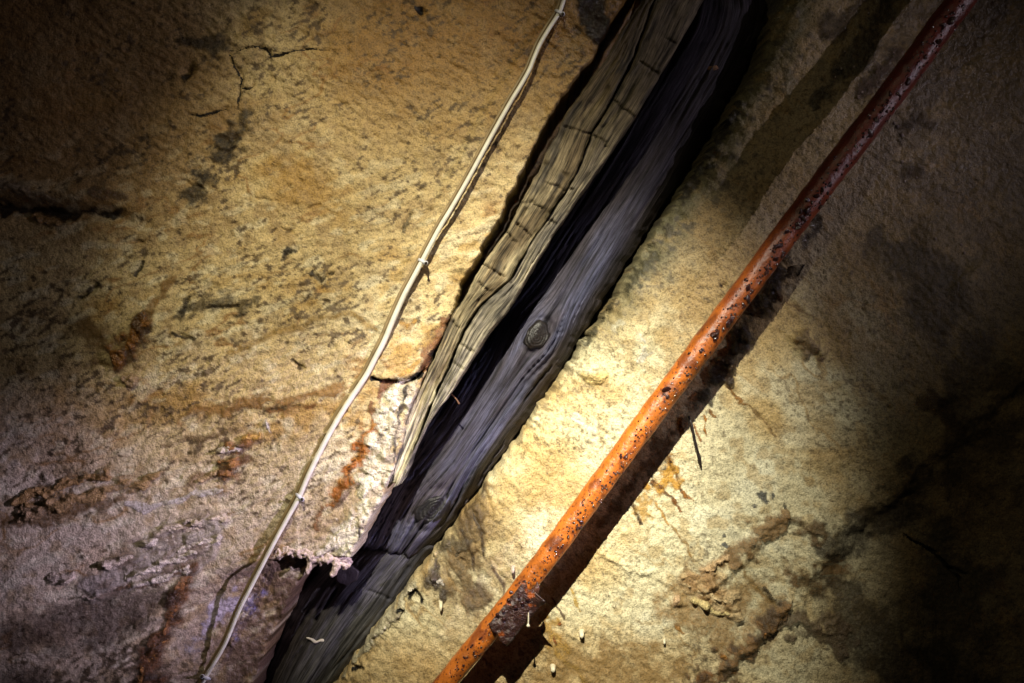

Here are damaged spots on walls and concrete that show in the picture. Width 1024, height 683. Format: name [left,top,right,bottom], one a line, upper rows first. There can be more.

crack [191,45,335,118]
rust [227,311,377,354]
rust [162,381,345,492]
peeling [316,378,418,558]
rust [313,315,452,531]
water stain [655,339,1024,683]